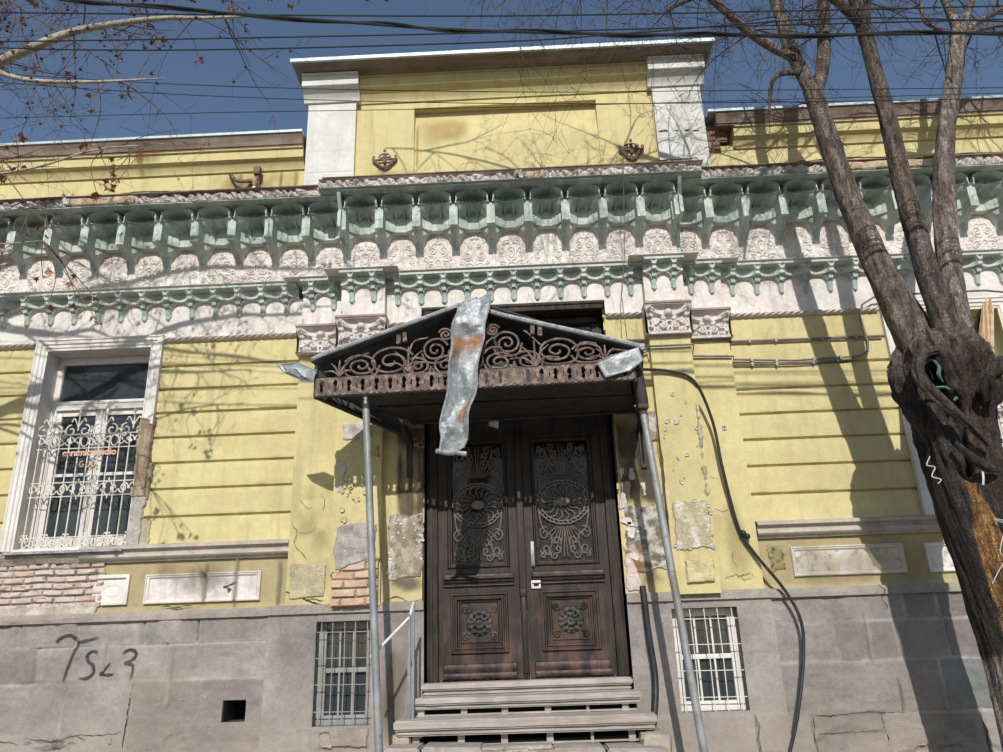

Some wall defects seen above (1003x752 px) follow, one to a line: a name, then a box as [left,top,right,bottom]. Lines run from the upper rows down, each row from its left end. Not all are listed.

corrosion [454,336,482,351]
spalling [145,462,155,500]
peeling [330,419,425,607]
spalling [617,400,716,573]
flaking render [0,552,106,617]
crack [0,684,133,746]